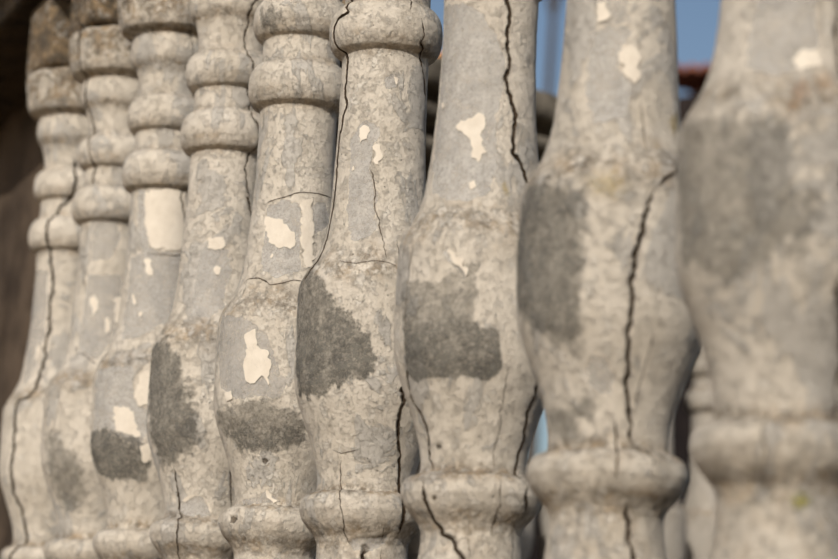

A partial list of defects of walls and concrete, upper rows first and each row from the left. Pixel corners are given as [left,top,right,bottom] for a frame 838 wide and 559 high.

crack [243,0,353,285]
peeling [432,3,505,201]
crack [504,0,528,183]
crack [9,1,97,559]
peeling [191,236,286,401]
leakage [224,416,305,452]
peeling [261,198,329,278]
leakage [295,270,377,401]
crack [334,170,470,559]
leakage [405,309,502,383]
leakage [516,183,584,345]
crack [614,167,677,480]